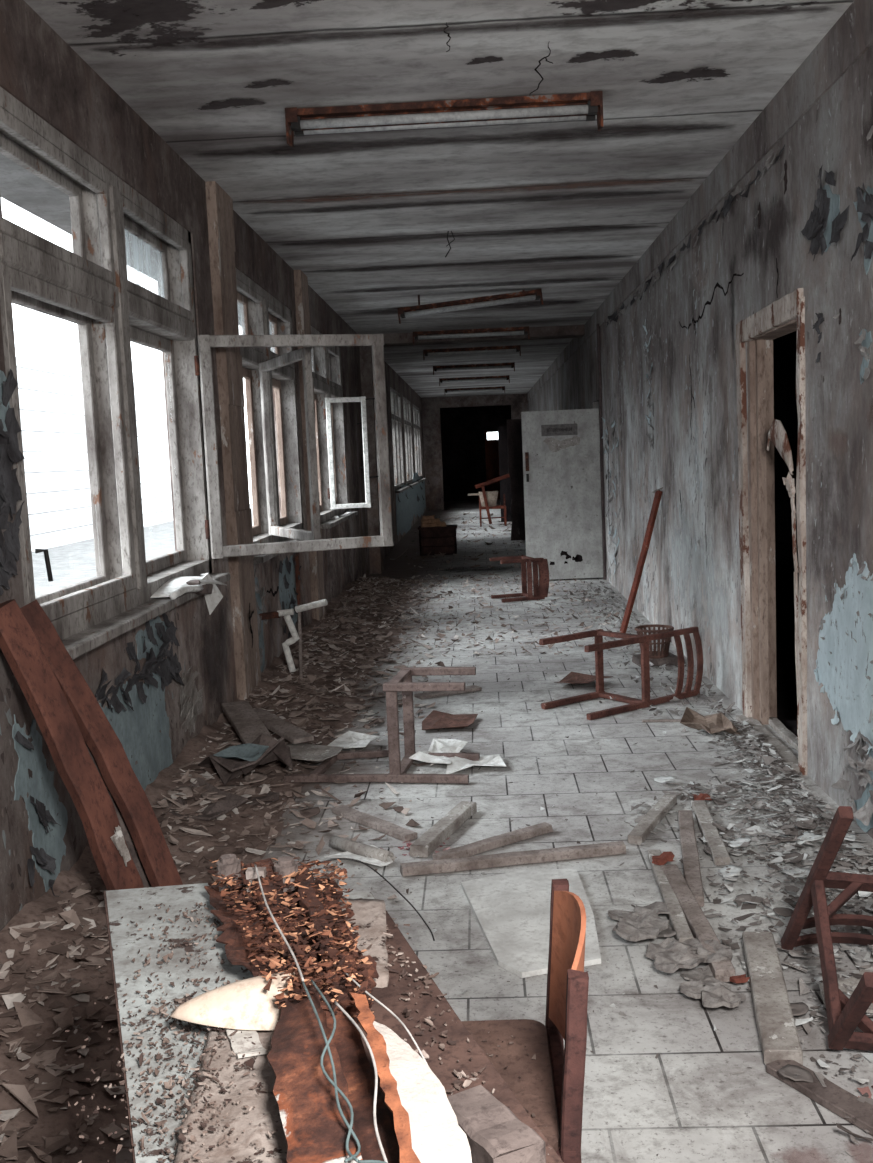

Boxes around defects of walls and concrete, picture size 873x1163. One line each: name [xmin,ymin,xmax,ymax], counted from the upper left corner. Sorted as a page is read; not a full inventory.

crack [530,43,553,94]
crack [679,273,744,440]
peeling [0,369,25,596]
peeling [369,138,873,1043]
peeling [95,608,232,791]
peeling [0,683,77,914]
peeling [814,1049,873,1105]
peeling [836,1116,873,1157]